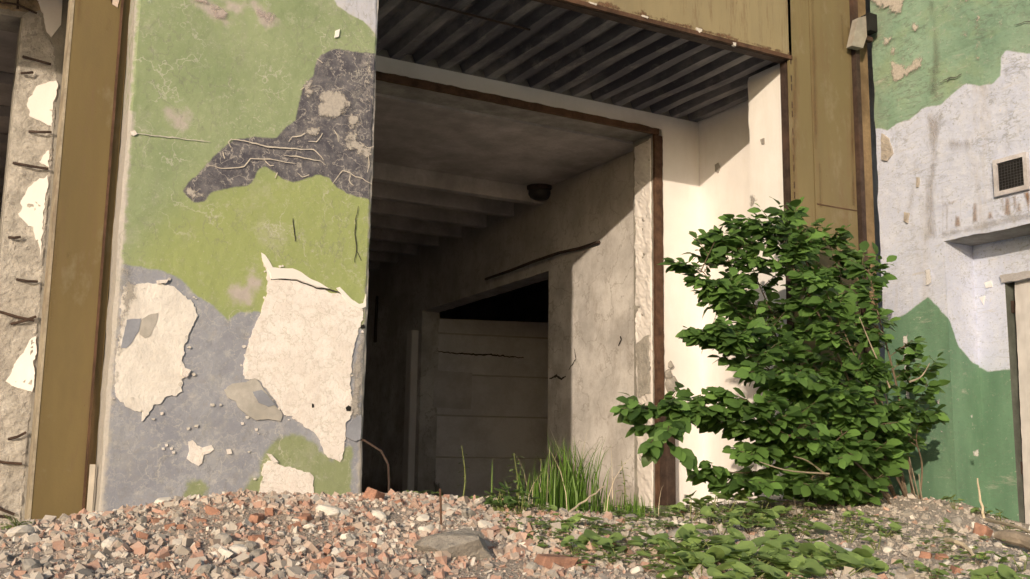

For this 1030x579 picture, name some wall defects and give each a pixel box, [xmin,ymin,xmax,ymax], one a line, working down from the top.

spalling [871,0,904,14]
spalling [884,37,922,82]
peeling [304,80,371,157]
peeling [881,133,894,161]
spalling [0,0,58,523]
peeling [113,270,198,421]
peeling [210,253,390,494]
crack [438,350,524,358]
peeling [162,425,232,466]